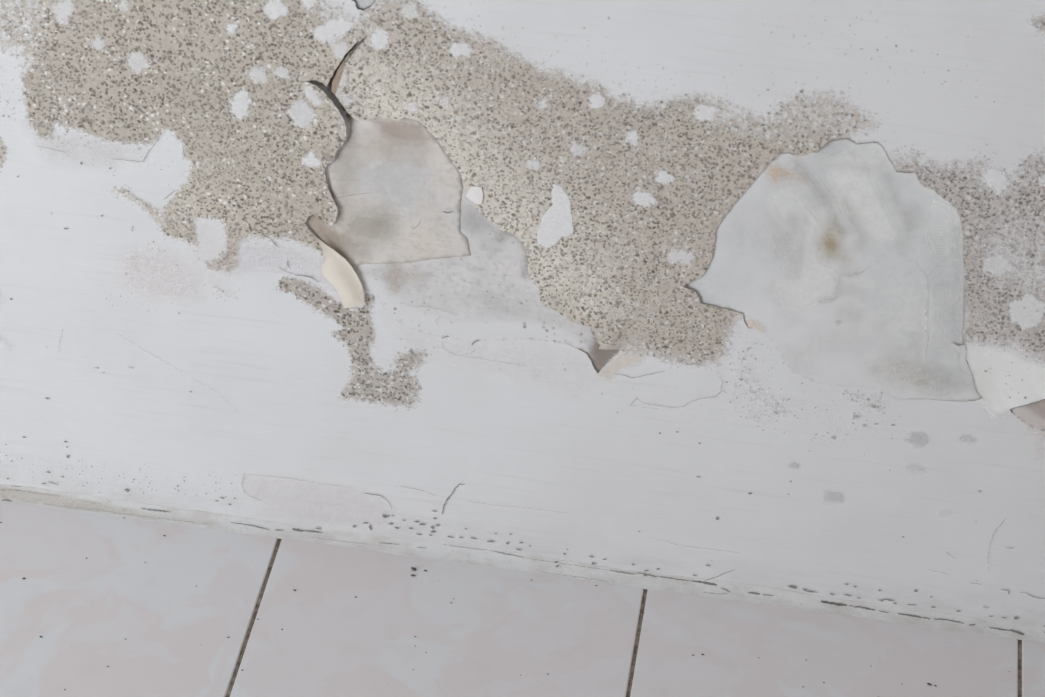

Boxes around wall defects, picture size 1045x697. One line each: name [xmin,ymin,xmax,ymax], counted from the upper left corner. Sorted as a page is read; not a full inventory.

peeling [353,0,375,11]
peeling [305,41,620,374]
peeling [685,139,982,401]
peeling [1009,397,1045,430]